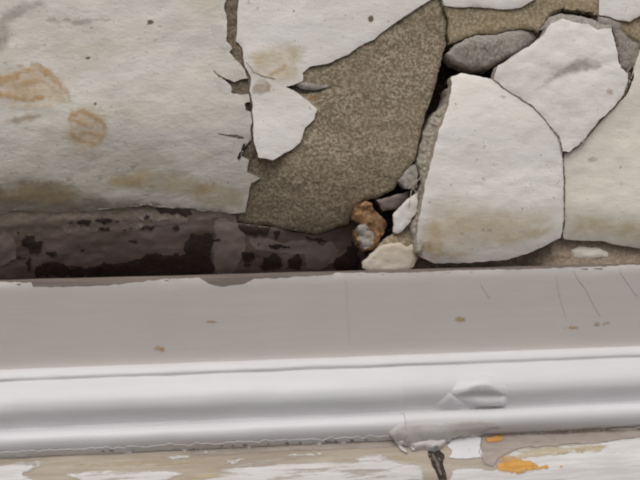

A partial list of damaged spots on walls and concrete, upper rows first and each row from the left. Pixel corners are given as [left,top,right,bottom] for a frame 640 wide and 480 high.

flaking render [0,0,640,280]
peeling [0,435,424,480]
rust [497,451,569,474]
peeling [447,427,640,480]